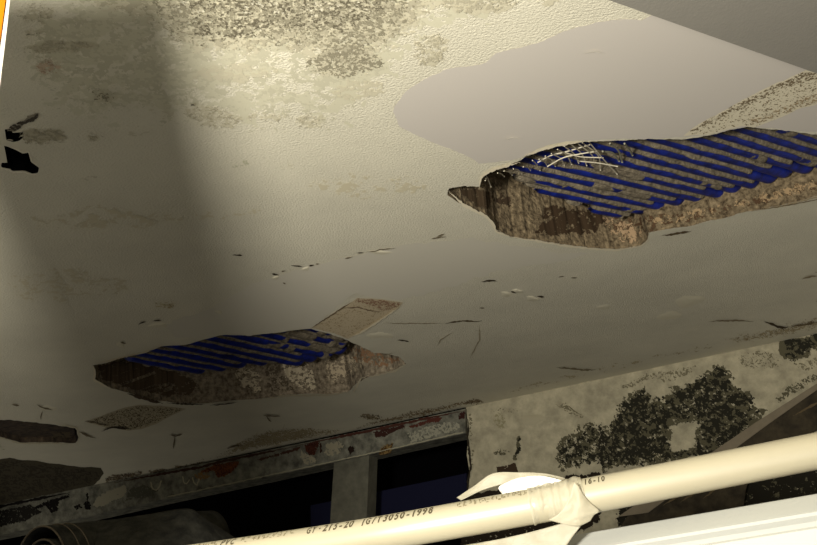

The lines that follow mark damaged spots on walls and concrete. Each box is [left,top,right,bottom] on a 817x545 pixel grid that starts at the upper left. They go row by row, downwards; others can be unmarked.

damp [16,0,518,142]
hole [1,129,39,175]
spalling [448,72,817,251]
spalling [92,298,406,429]
damp [725,318,817,403]
spalling [0,420,80,445]
rust [257,440,322,461]
rust [373,417,442,455]
damp [555,364,768,479]